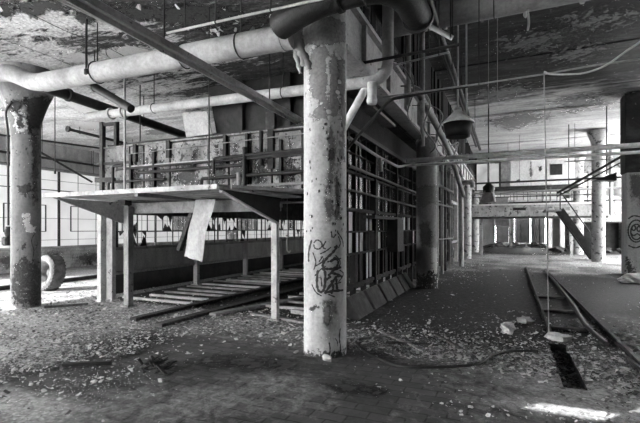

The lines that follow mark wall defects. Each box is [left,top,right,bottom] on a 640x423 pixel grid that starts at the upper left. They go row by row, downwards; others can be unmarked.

peeling [0,0,97,28]
peeling [31,35,58,44]
peeling [484,1,640,66]
peeling [56,44,150,66]
peeling [303,16,346,165]
peeling [0,109,28,133]
peeling [22,213,36,233]